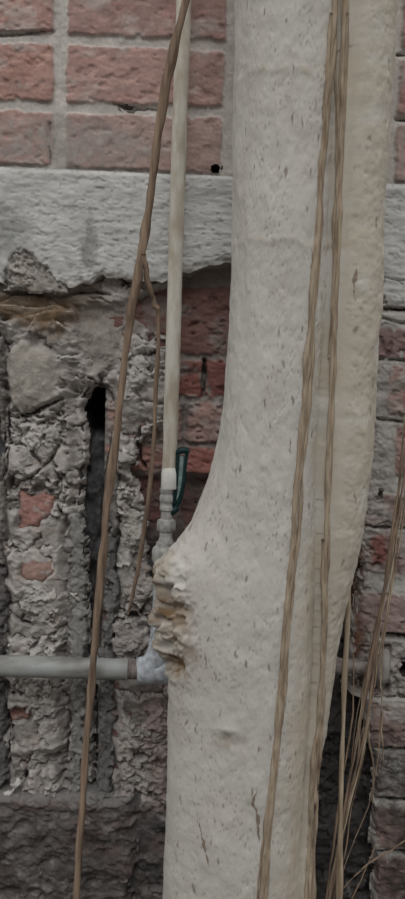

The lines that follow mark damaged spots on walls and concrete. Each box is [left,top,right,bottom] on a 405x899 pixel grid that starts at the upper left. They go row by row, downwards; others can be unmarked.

spalling [0,249,168,660]
spalling [172,266,232,543]
spalling [0,676,169,812]